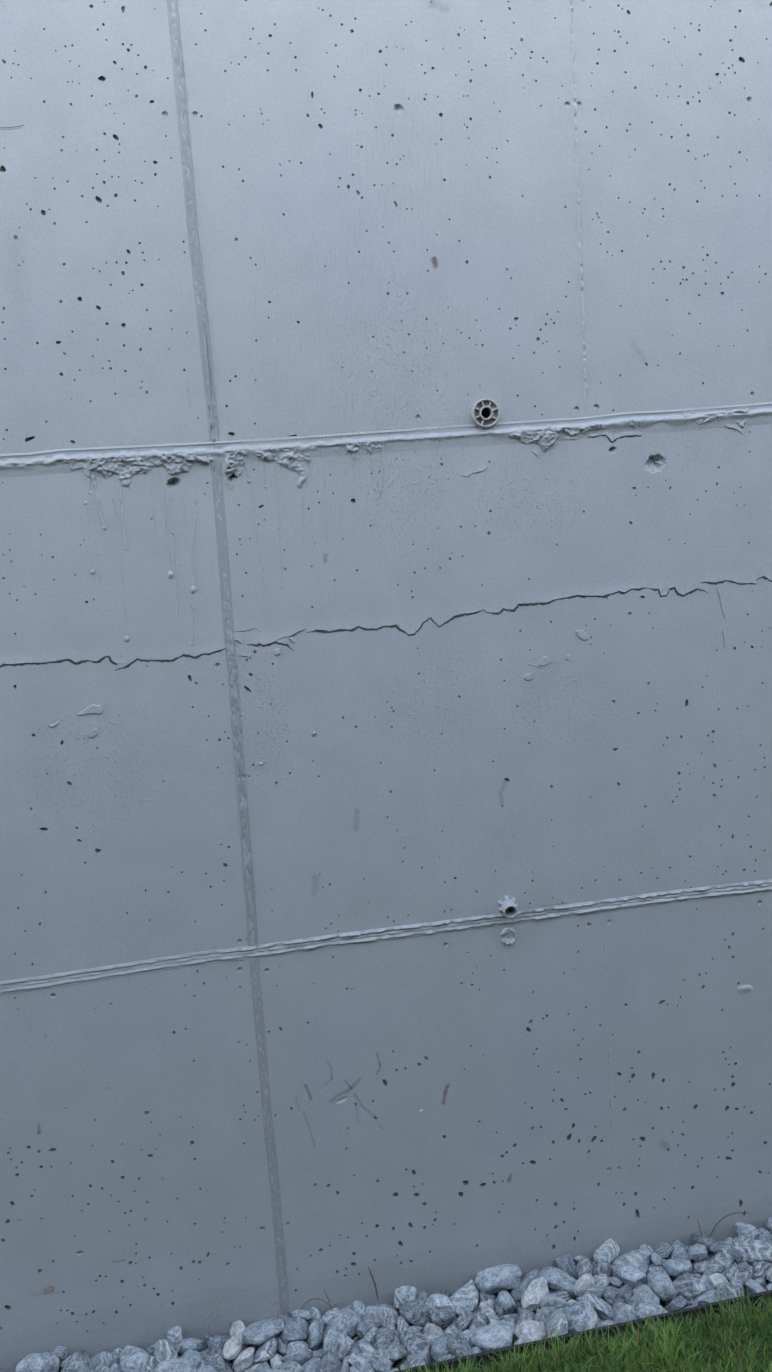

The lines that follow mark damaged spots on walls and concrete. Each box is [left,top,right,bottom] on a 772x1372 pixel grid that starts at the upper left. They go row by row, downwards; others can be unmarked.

spalling [502,407,749,459]
spalling [644,453,667,474]
crack [0,566,772,671]